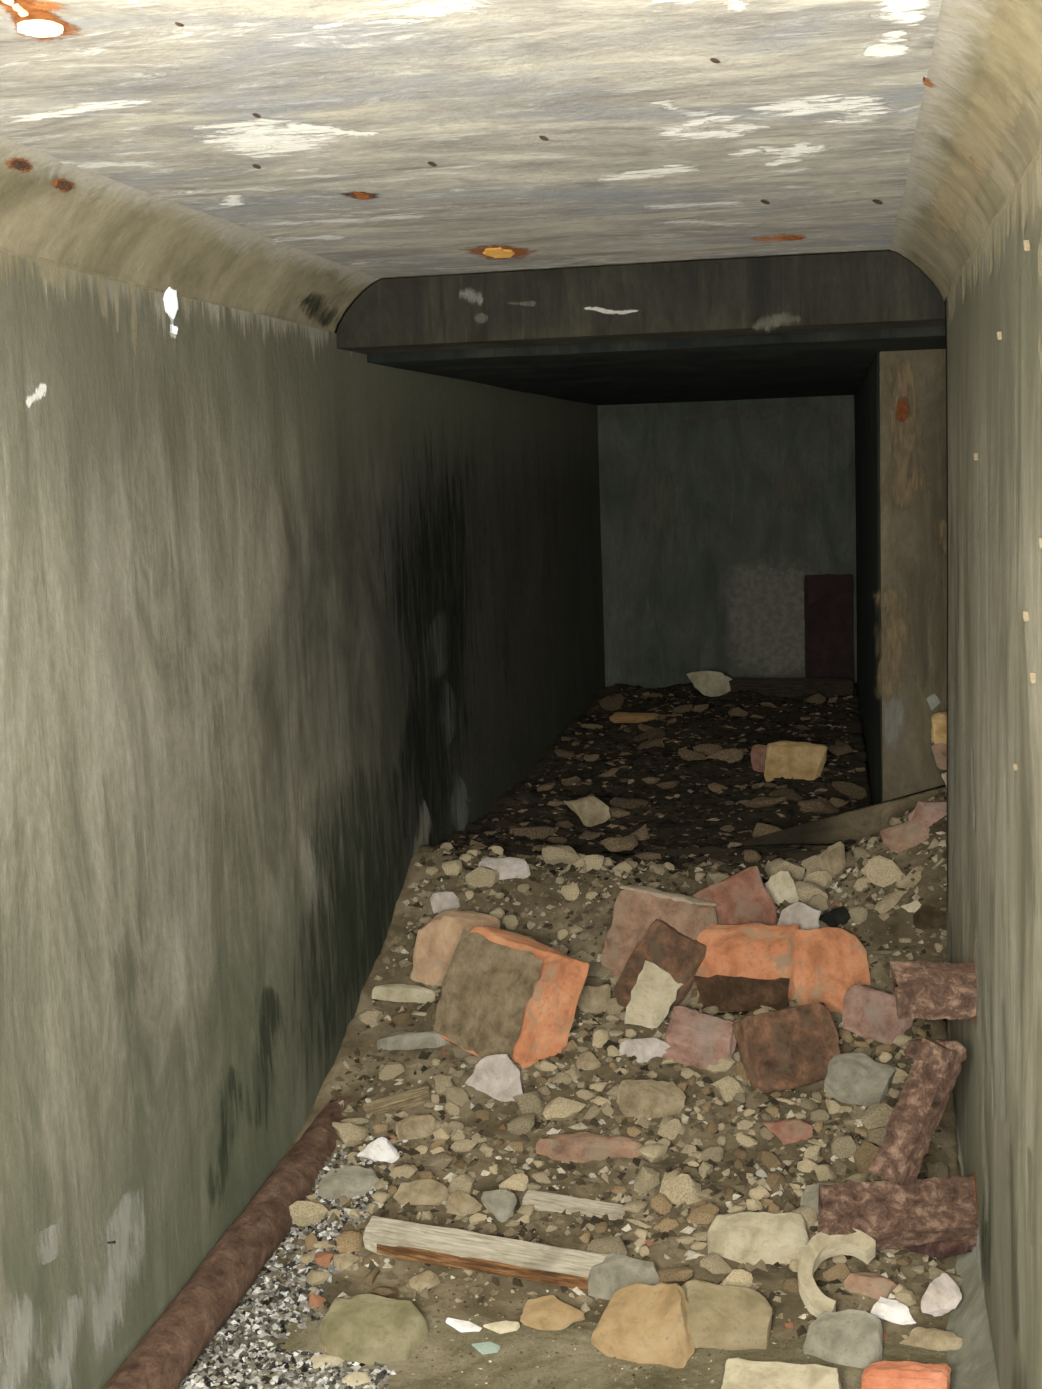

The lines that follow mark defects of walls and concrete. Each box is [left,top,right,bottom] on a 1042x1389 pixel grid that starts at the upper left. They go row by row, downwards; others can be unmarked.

corrosion [0,0,78,40]
corrosion [464,245,535,259]